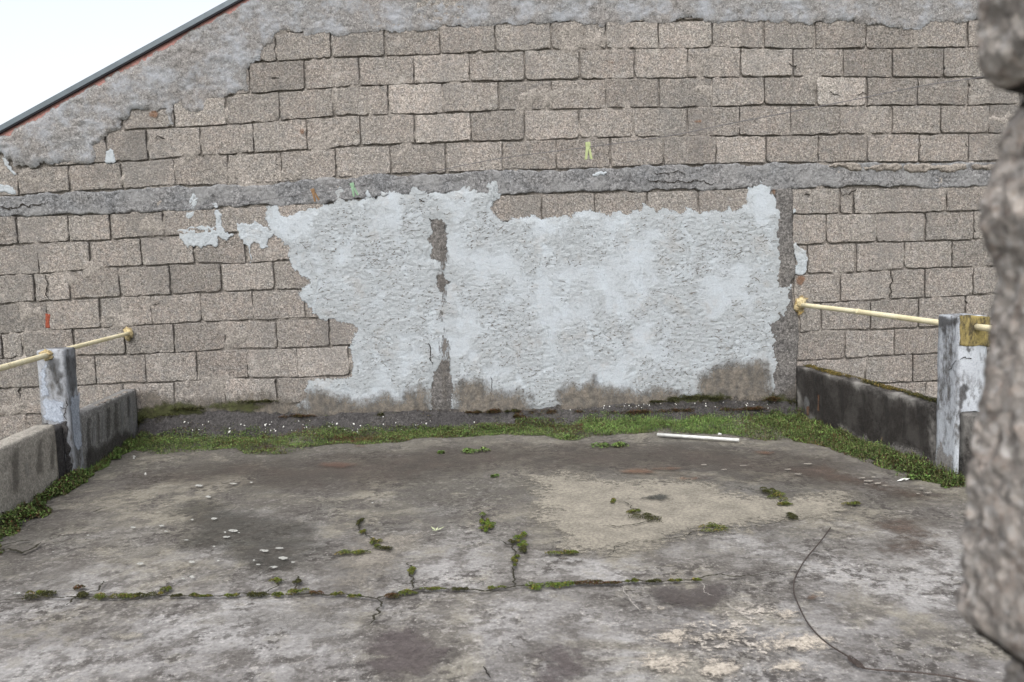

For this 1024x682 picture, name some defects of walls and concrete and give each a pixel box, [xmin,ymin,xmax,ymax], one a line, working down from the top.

peeling [0,157,17,195]
peeling [105,148,116,164]
flaking render [427,218,453,412]
leakage [453,378,534,412]
leakage [556,375,680,410]
leakage [695,360,773,402]
leakage [786,369,931,460]
leakage [87,431,134,469]
crack [603,483,793,555]
crack [0,515,806,626]